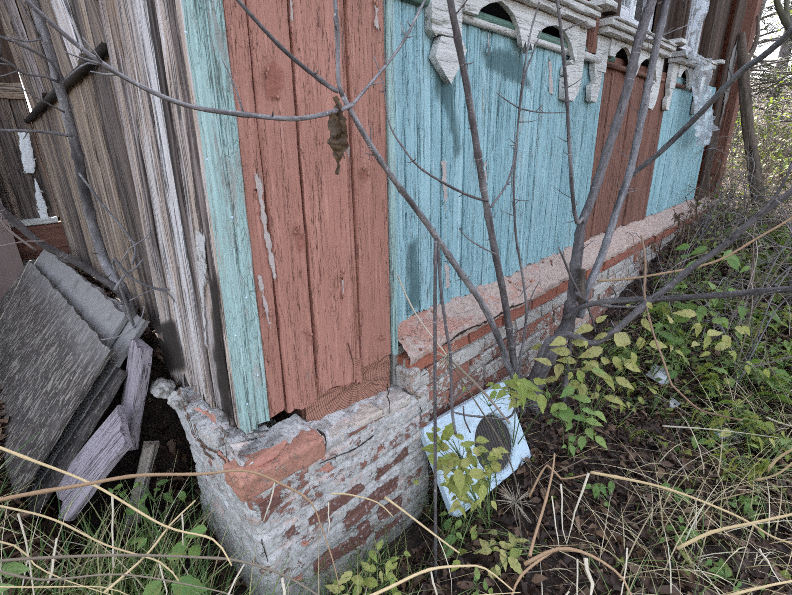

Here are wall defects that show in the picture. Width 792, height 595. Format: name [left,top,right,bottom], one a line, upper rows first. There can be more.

peeling [254,174,276,279]
peeling [258,275,272,329]
flaking render [424,304,564,422]
spalling [259,493,287,525]
spalling [282,525,311,547]
spalling [308,446,408,575]